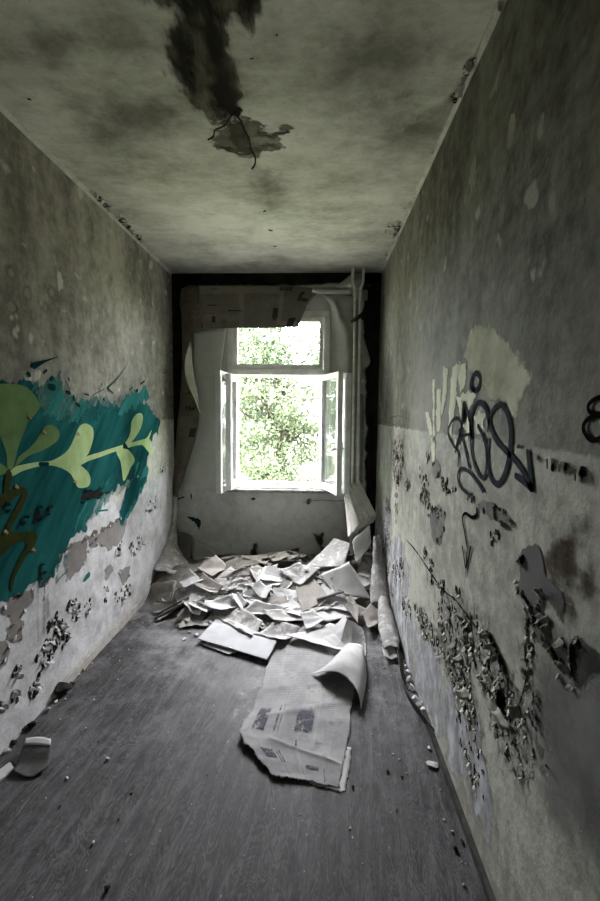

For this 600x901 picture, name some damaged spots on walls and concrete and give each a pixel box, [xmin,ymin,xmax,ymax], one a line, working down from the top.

leakage [154,0,294,158]
flaking render [450,57,477,103]
peeling [158,273,351,473]
flaking render [65,518,144,603]
peeling [362,273,600,860]